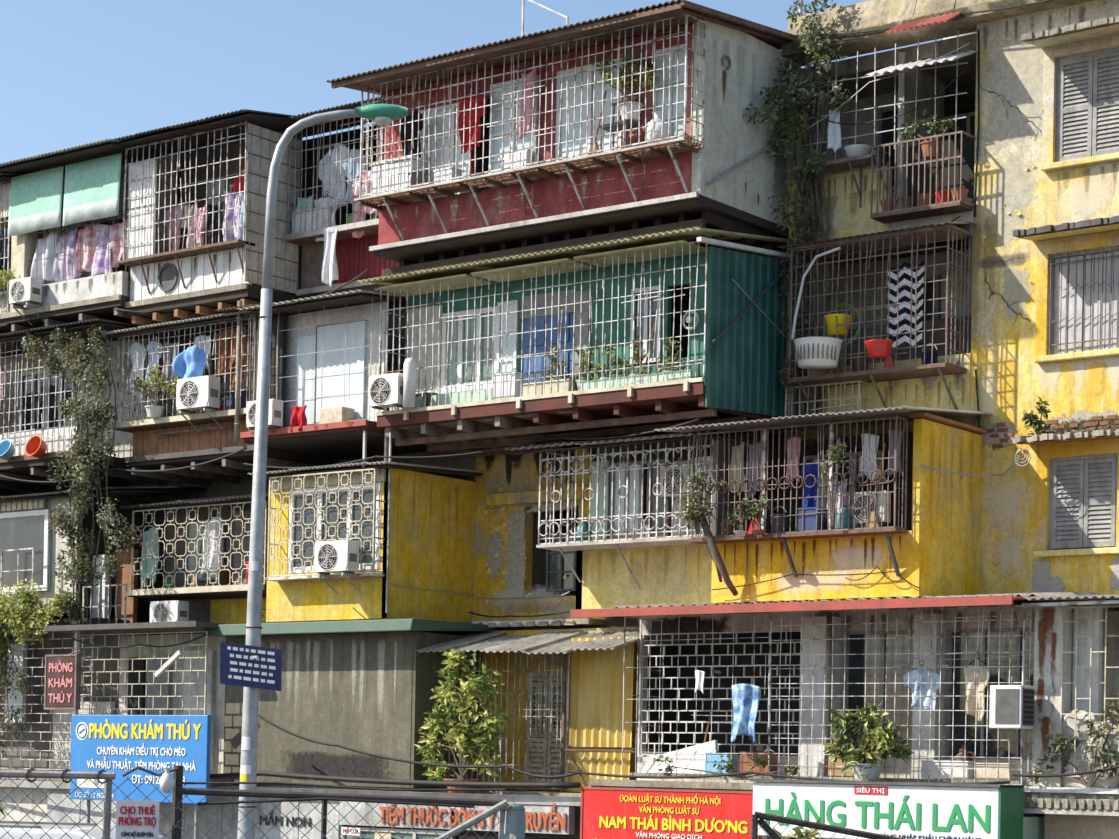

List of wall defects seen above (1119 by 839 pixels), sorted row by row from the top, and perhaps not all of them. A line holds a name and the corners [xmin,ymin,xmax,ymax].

crack [980,86,1042,142]
crack [974,256,1031,323]
flaking render [975,408,1119,450]
flaking render [472,478,580,628]
rust [1037,608,1057,752]
water stain [289,751,391,779]